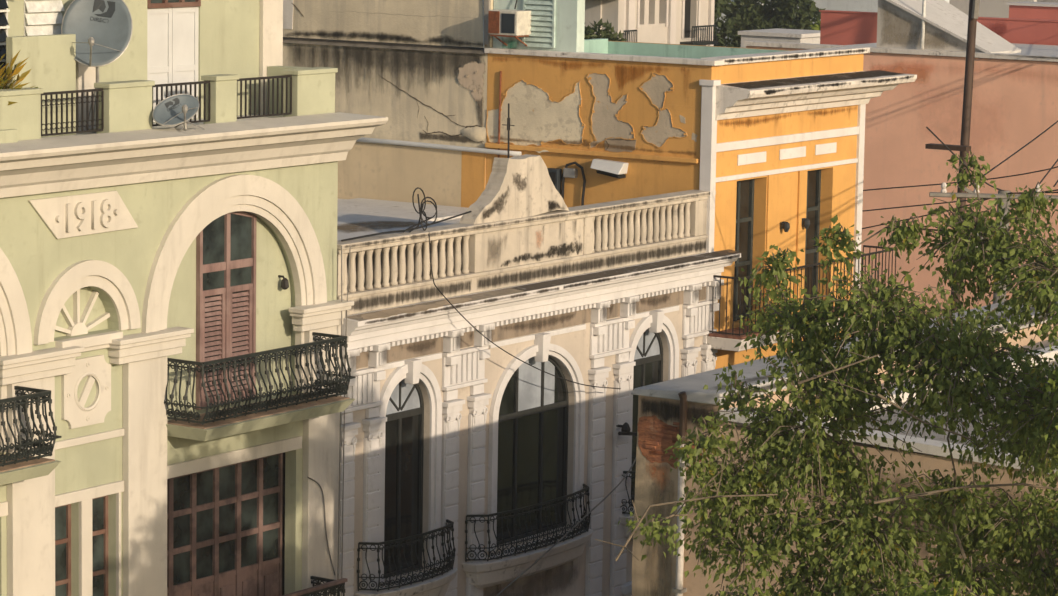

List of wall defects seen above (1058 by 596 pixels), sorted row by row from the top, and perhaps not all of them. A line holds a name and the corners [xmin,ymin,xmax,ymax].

water stain [283,32,486,75]
crack [379,75,484,142]
peeling [458,62,698,153]
water stain [337,175,710,248]
water stain [347,241,742,323]
spalling [638,415,704,469]